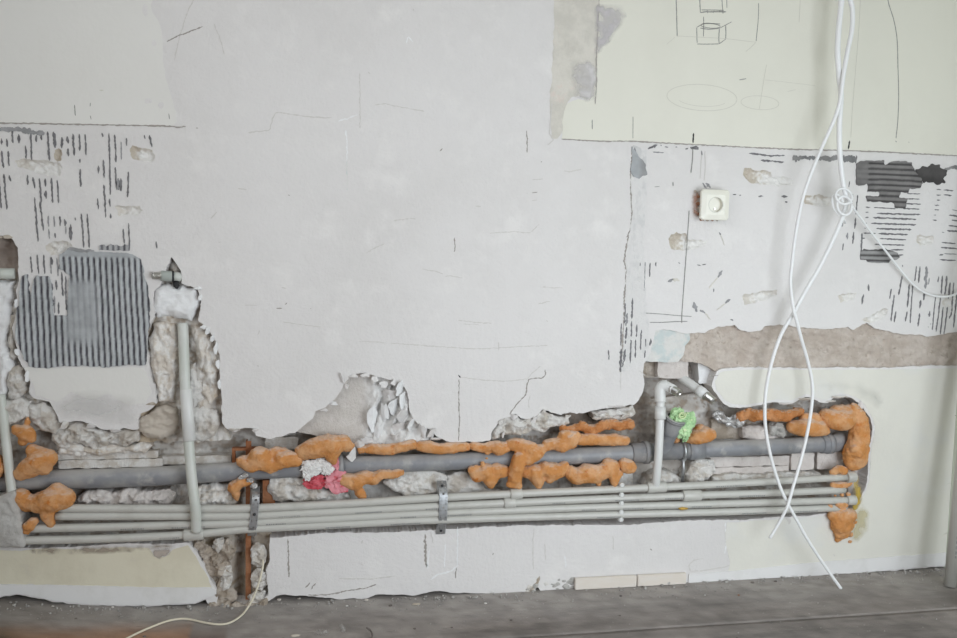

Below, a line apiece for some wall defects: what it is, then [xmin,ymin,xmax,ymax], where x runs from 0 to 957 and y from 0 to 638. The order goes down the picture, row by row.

flaking render [130,145,155,162]
peeling [465,0,957,571]
flaking render [0,235,448,470]
crack [359,320,547,441]
flaking render [72,450,858,519]
peeling [0,487,272,608]